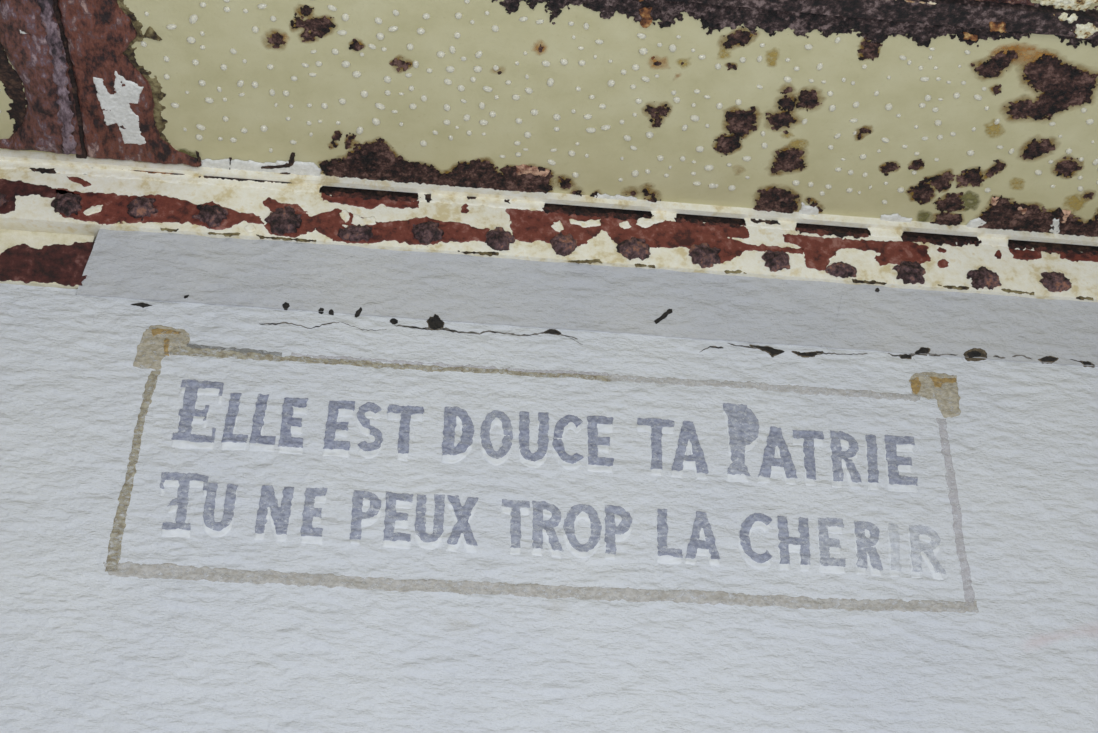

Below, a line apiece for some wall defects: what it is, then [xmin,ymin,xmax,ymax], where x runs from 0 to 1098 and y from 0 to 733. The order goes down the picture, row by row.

corrosion [977,0,1098,11]
peeling [1053,12,1098,39]
corrosion [971,45,1098,134]
corrosion [674,87,825,228]
corrosion [1020,138,1083,178]
peeling [0,176,490,247]
corrosion [880,159,1098,257]
peeling [0,242,95,287]
peeling [505,208,949,271]
crack [261,314,583,345]
crack [699,306,956,359]
crack [993,355,1095,368]